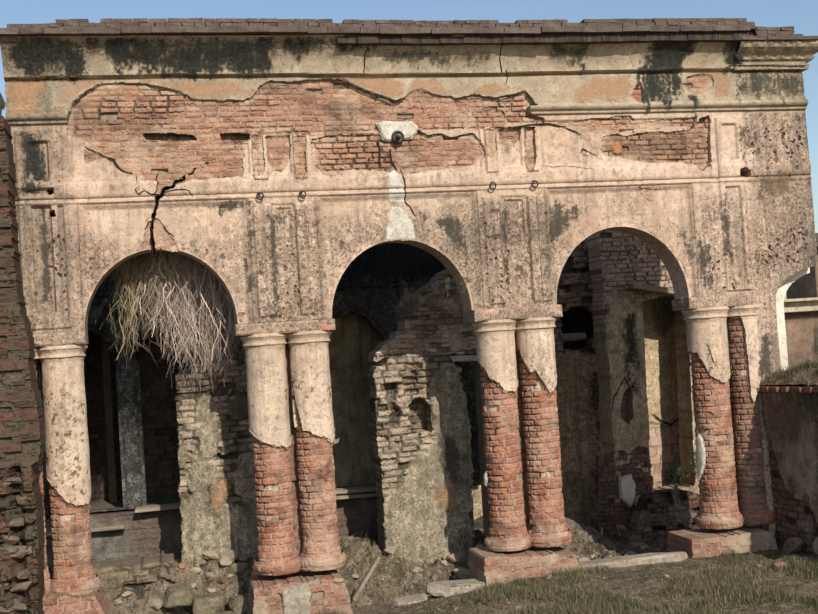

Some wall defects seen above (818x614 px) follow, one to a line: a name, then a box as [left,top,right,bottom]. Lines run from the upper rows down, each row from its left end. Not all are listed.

crack [85,146,213,256]
flaking render [67,80,543,195]
crack [378,140,416,216]
flaking render [556,115,709,171]
spalling [227,389,248,420]
flaking render [248,385,342,562]
flaking render [480,351,568,539]
flaking render [690,313,818,555]
flaking render [46,475,96,583]